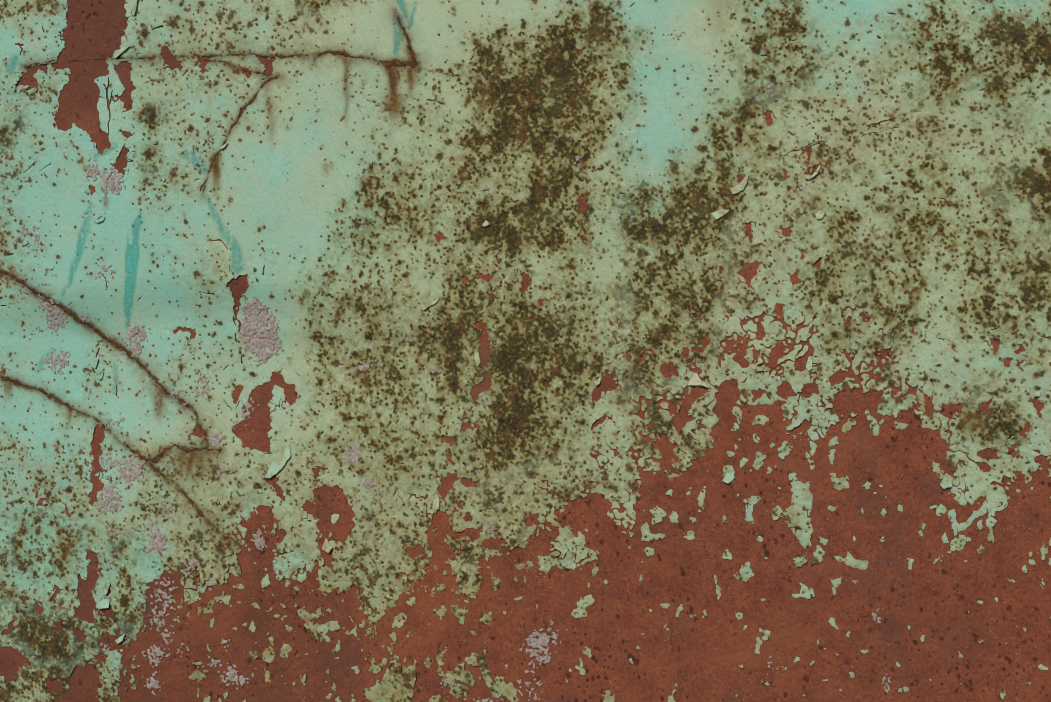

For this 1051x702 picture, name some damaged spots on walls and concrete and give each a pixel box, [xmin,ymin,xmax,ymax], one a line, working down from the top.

peeling [16,0,137,175]
corrosion [887,0,1051,119]
corrosion [294,0,837,499]
peeling [790,249,822,285]
corrosion [772,126,1051,377]
corrosion [947,389,1033,458]
peeling [45,303,1051,702]
peeling [0,619,32,681]
peeling [19,585,63,619]